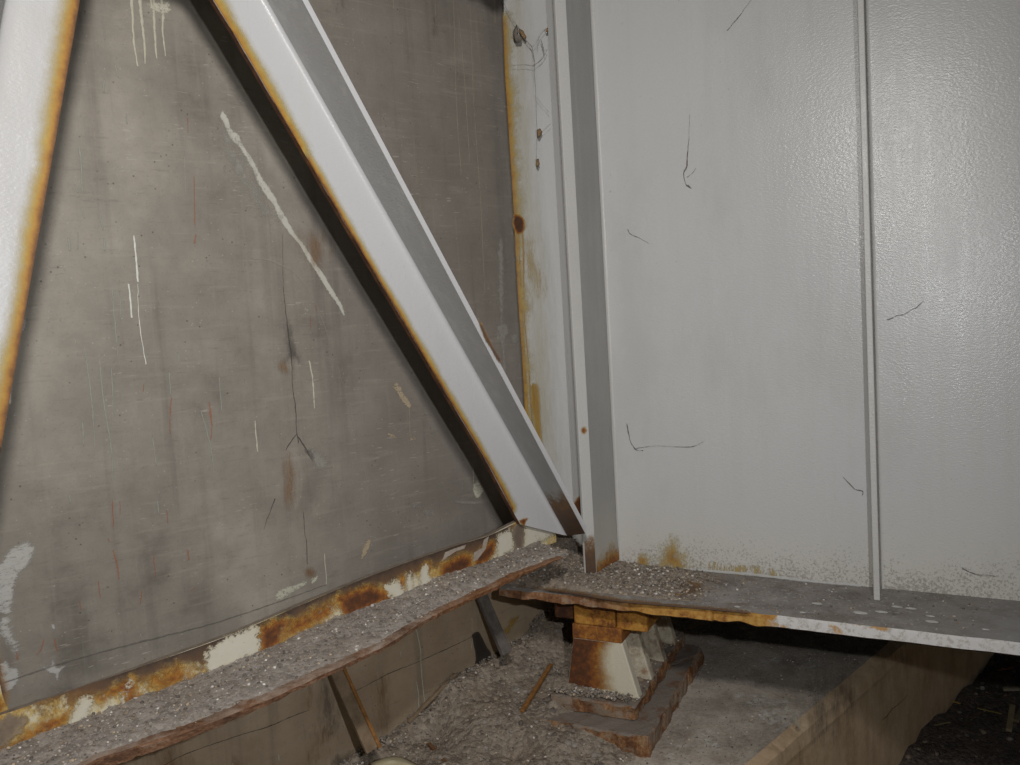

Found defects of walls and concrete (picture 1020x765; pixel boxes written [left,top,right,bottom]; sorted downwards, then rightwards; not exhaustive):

corrosion [503,14,542,442]
corrosion [0,0,527,750]
crack [283,287,309,454]
corrosion [522,543,750,613]
peeling [0,661,19,691]
corrosion [569,638,608,690]